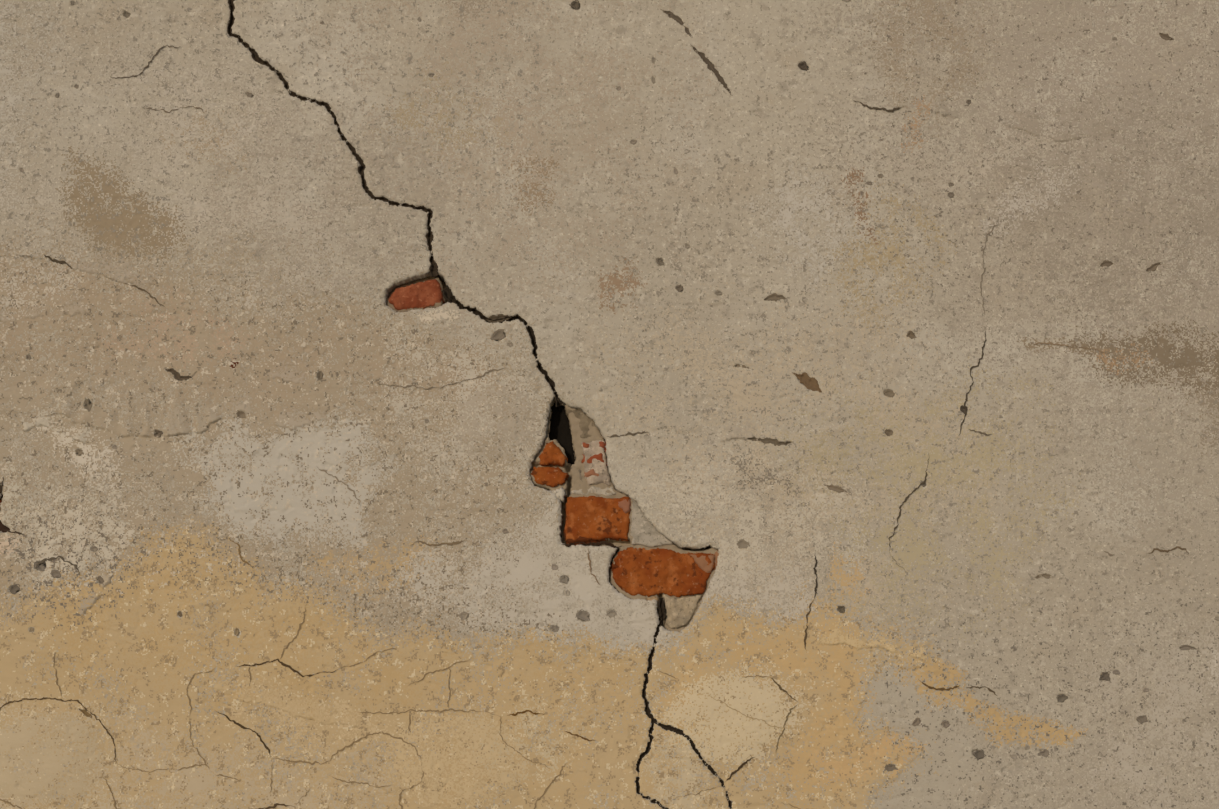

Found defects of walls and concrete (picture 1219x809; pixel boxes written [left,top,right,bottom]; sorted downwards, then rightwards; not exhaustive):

crack [111,45,178,78]
crack [227,0,564,407]
crack [44,255,72,269]
spalling [386,275,448,312]
crack [607,430,646,438]
crack [35,556,80,575]
crack [562,541,621,585]
spalling [529,398,719,632]
peeling [0,684,428,809]
crack [0,604,565,809]
peeling [468,685,592,787]
crack [635,598,797,809]